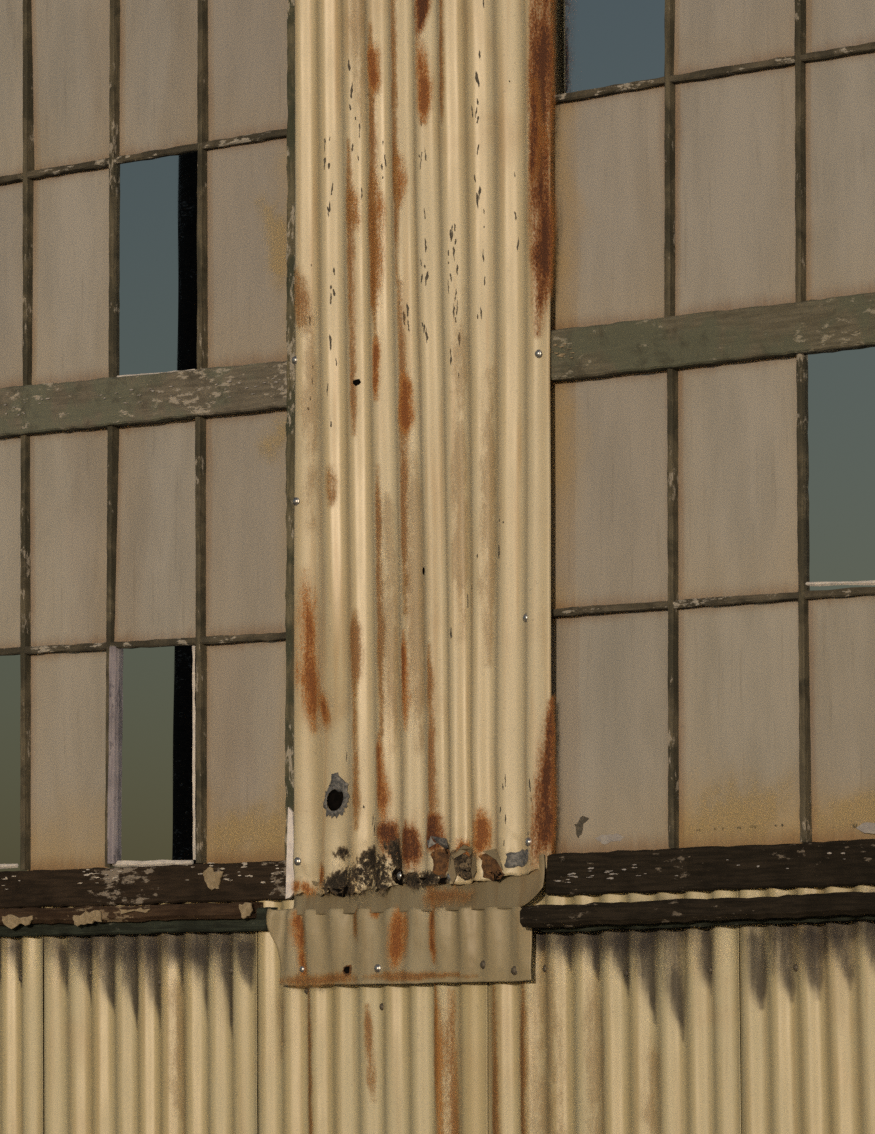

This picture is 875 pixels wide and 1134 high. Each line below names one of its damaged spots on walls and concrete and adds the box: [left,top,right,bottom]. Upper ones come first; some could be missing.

corrosion [414,0,444,124]
corrosion [528,0,555,336]
corrosion [346,0,414,594]
corrosion [282,478,556,1134]
damp [12,942,22,981]
peeling [2,914,33,929]
peeling [73,910,102,926]
damp [59,932,254,1028]
peeling [192,862,284,890]
peeling [239,902,253,919]
damp [537,927,689,1028]
damp [749,919,875,1002]